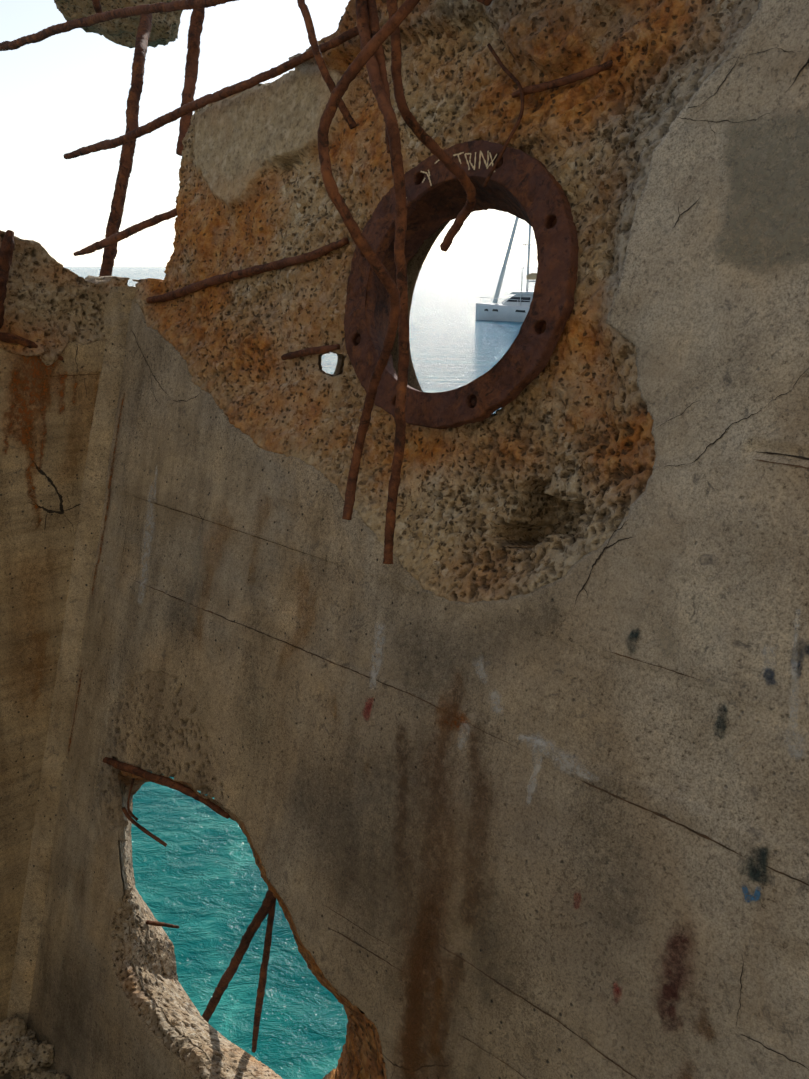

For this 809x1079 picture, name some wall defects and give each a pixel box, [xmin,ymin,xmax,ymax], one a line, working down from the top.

crack [676,48,809,133]
spalling [0,0,760,603]
corrosion [0,355,77,524]
crack [26,461,80,535]
crack [664,368,809,467]
spalling [111,888,221,1079]
spalling [202,890,276,1053]